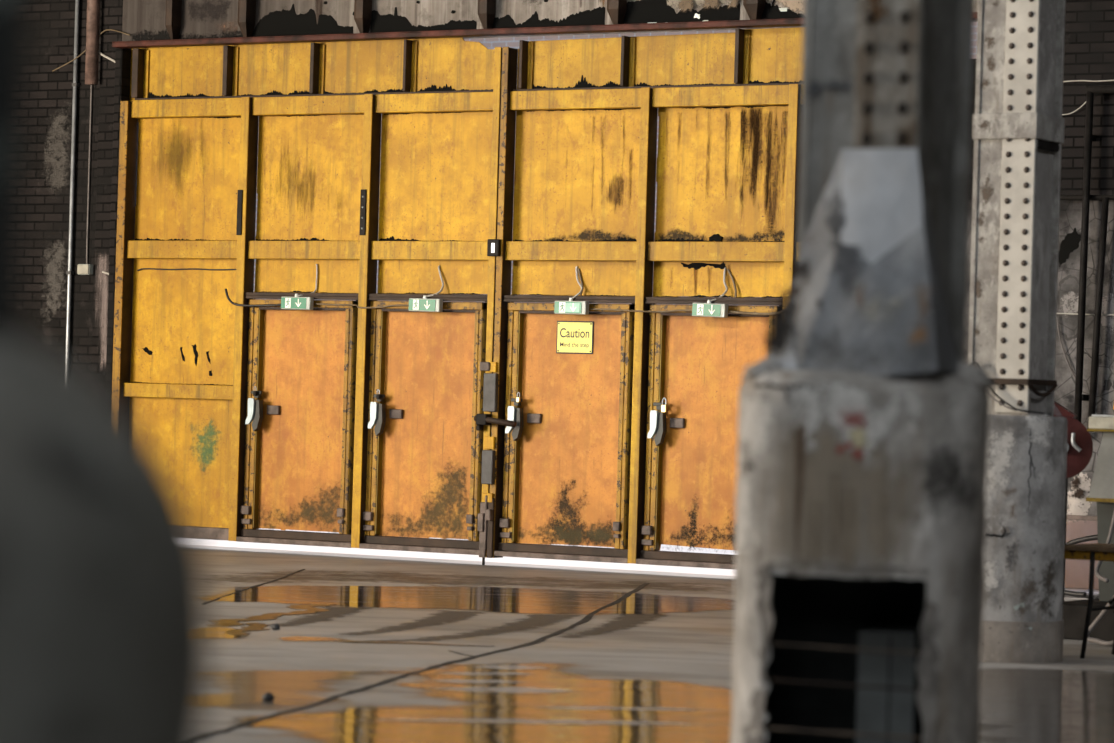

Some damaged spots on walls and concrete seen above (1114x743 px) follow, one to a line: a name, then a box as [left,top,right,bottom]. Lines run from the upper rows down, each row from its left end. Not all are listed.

peeling [623,0,740,24]
peeling [734,393,775,555]
peeling [801,381,923,458]
peeling [948,387,1016,491]
crack [986,429,1035,538]
crack [205,569,336,636]
crack [198,583,649,740]